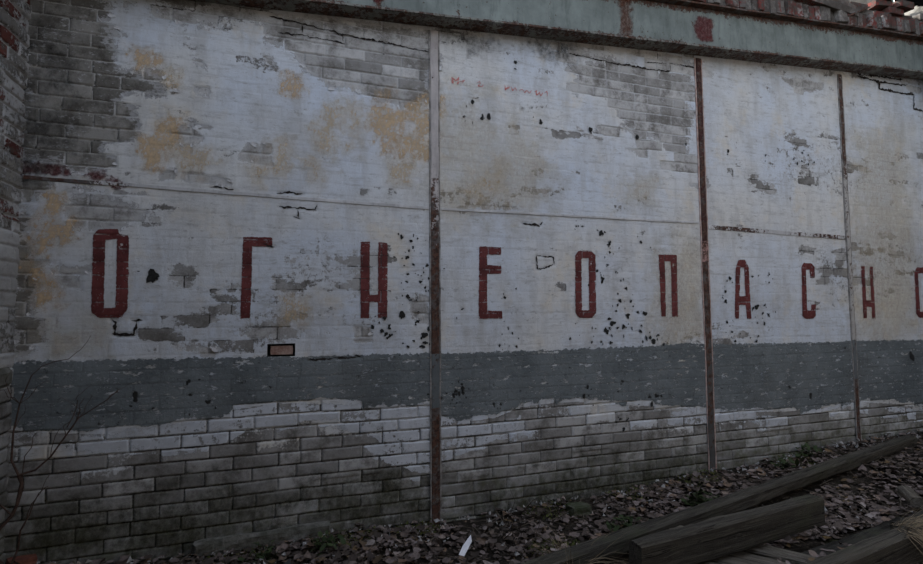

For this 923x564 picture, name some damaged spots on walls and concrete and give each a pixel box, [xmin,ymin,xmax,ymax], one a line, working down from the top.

corrosion [694,16,713,42]
peeling [13,0,181,364]
leakage [371,91,429,182]
peeling [549,40,714,188]